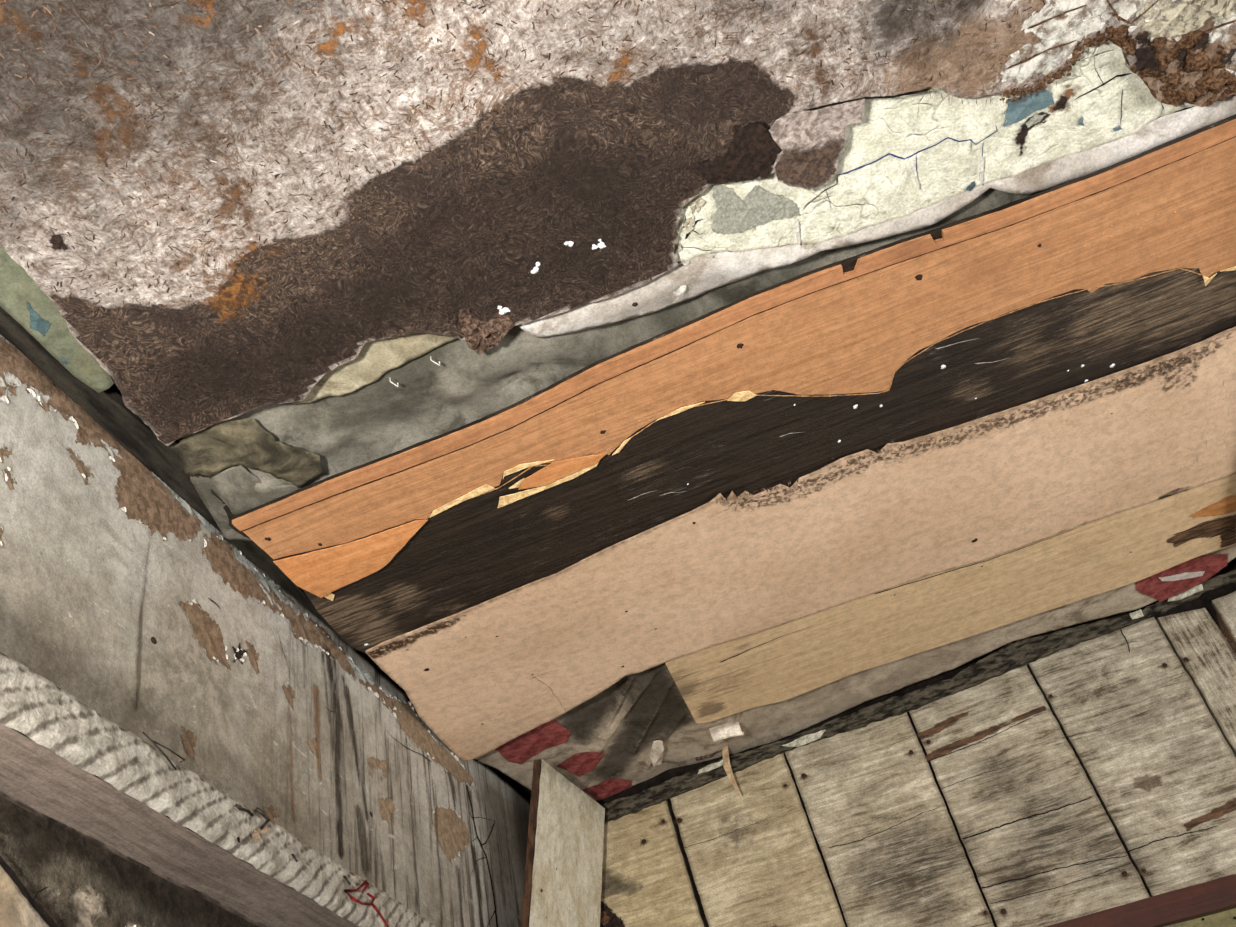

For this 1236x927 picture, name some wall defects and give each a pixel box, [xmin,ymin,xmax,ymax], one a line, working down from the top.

peeling [27,302,51,336]
damp [49,59,796,444]
peeling [674,0,1236,266]
peeling [0,335,474,789]
peeling [378,797,395,823]